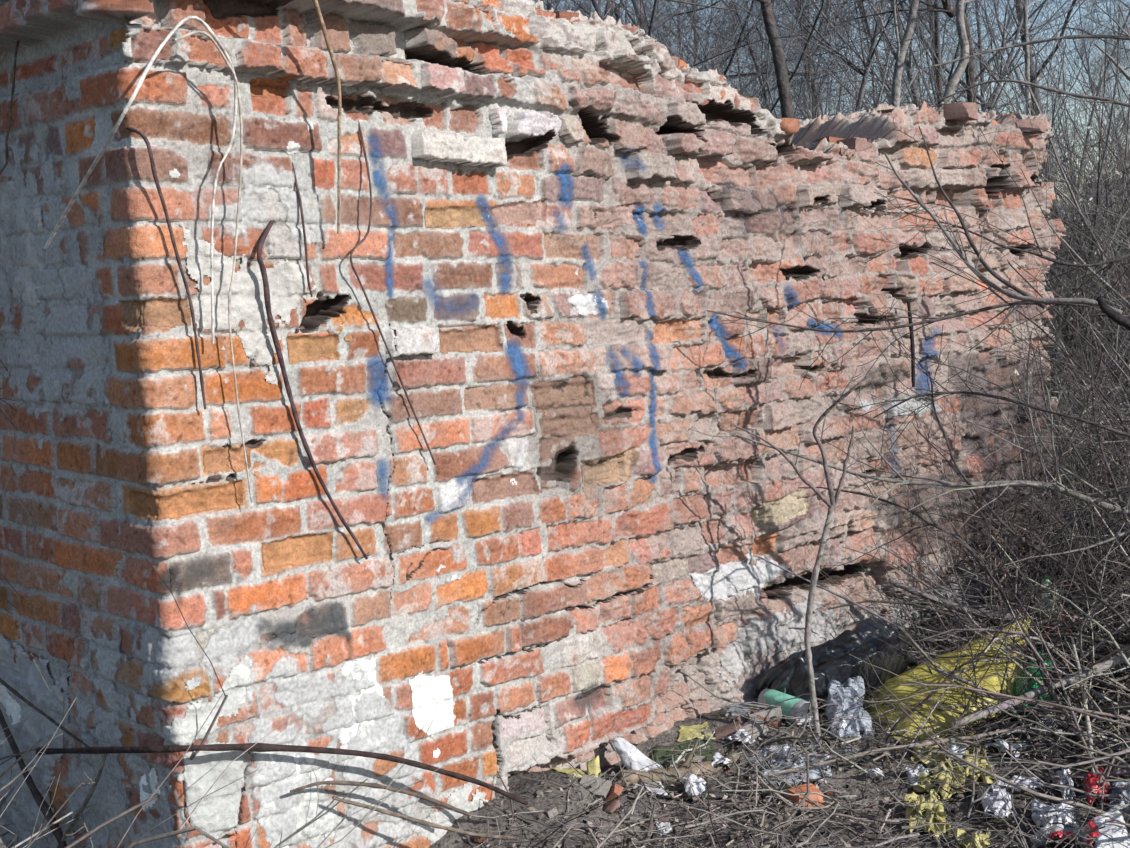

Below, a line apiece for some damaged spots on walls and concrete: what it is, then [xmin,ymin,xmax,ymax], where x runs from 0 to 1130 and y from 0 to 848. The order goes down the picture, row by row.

spalling [404,45,486,80]
spalling [325,95,433,119]
spalling [505,130,555,159]
spalling [578,106,620,145]
spalling [655,99,880,161]
spalling [286,276,353,364]
crack [379,323,449,605]
spalling [470,381,640,501]
crack [477,574,653,620]
spalling [763,565,866,599]
crack [478,637,566,663]
crack [491,704,541,787]